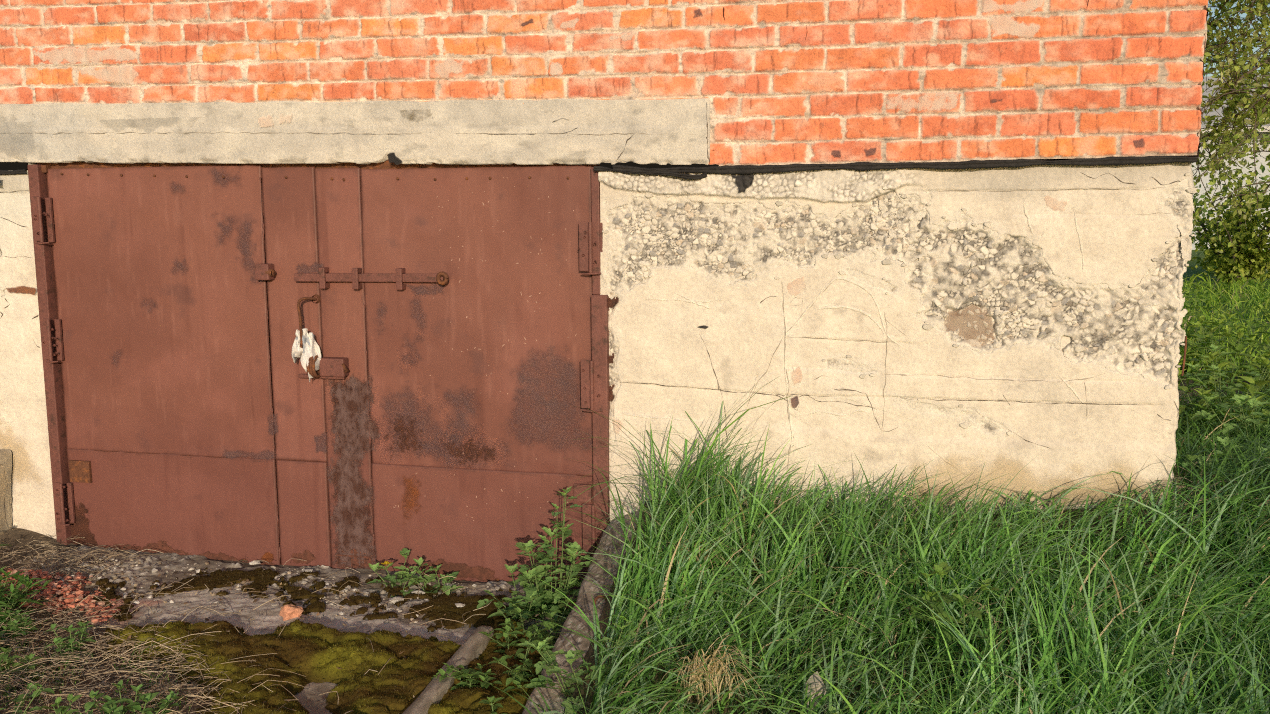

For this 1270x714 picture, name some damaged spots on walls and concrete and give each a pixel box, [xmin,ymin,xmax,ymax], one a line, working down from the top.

rust [328,375,422,570]
spalling [600,172,1198,521]
crack [620,281,1179,469]